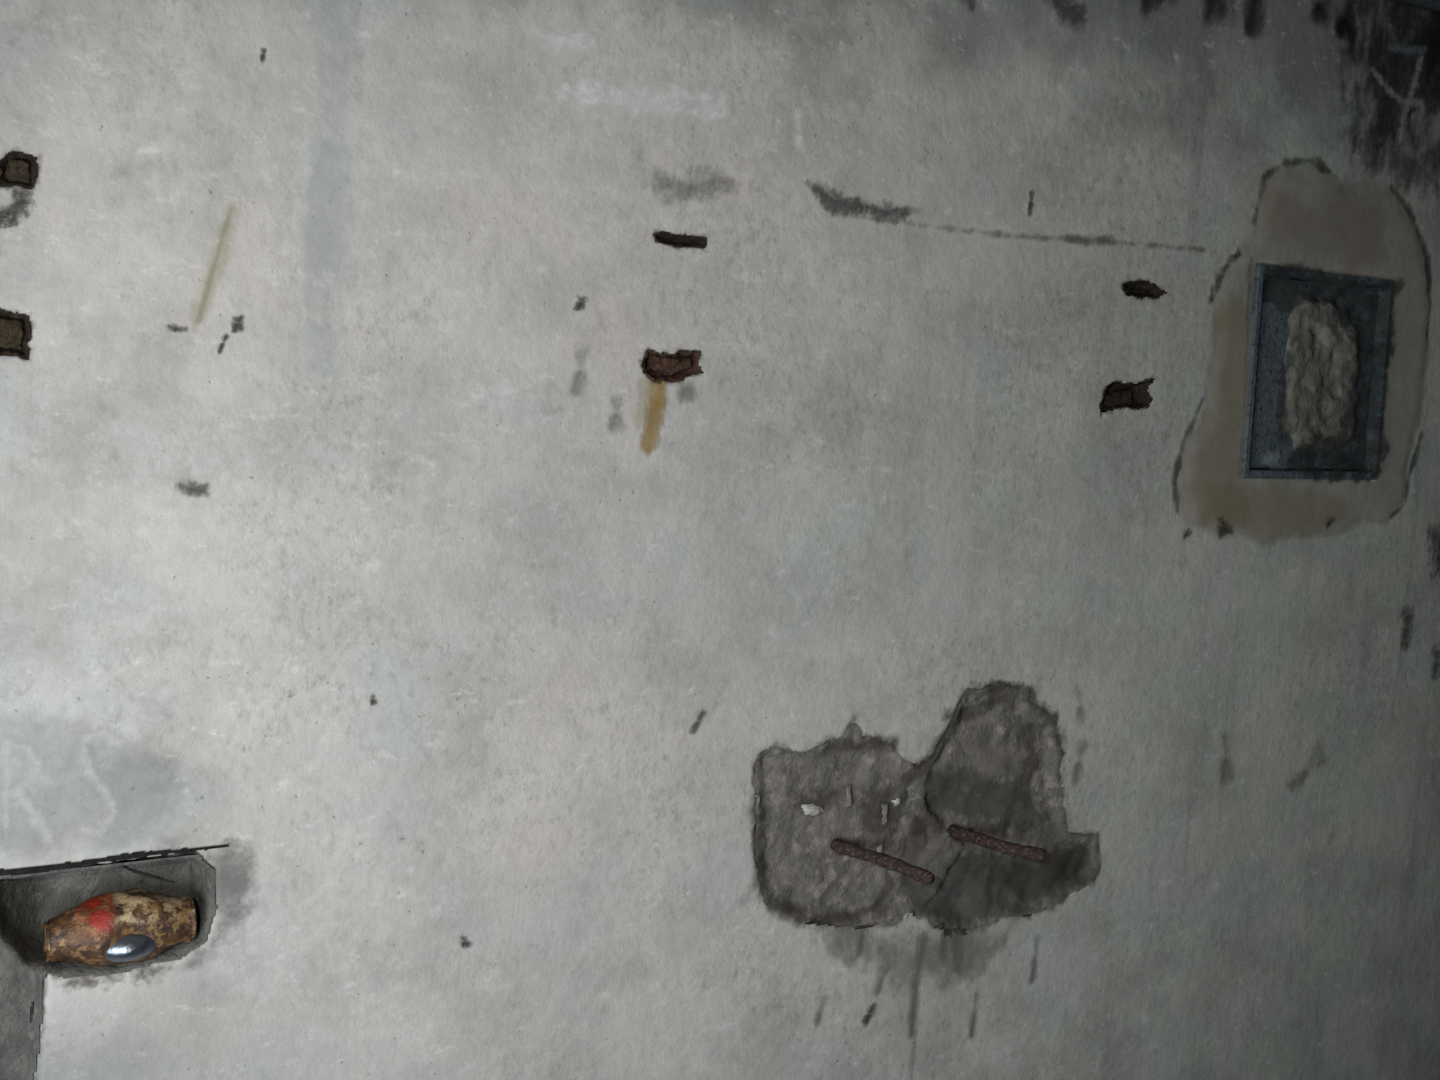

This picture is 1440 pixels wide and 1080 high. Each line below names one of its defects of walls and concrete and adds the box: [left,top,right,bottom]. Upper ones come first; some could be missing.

water stain [1313,0,1440,188]
rust [637,370,666,453]
spalling [750,681,1101,931]
spalling [0,853,217,1080]